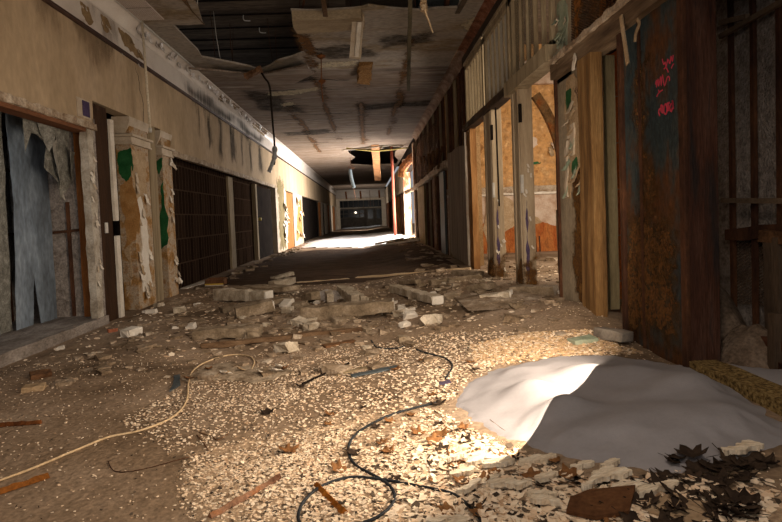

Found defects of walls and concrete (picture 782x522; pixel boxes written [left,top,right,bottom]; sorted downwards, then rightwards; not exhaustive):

spalling [292,8,365,57]
peeling [548,73,580,199]
peeling [0,148,782,522]